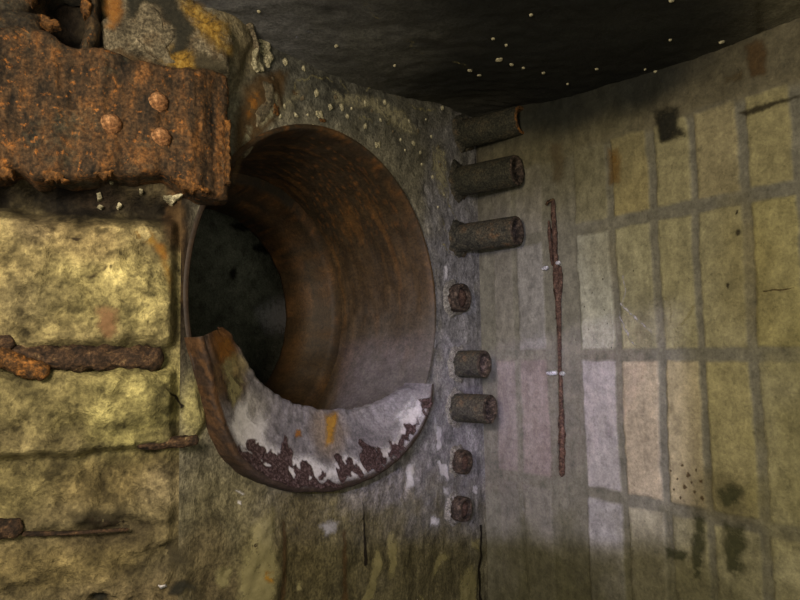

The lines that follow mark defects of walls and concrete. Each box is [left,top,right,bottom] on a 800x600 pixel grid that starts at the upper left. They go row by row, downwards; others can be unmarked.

rust [222,72,285,186]
rust [44,171,71,185]
rust [509,155,525,185]
rust [510,216,524,245]
rust [0,308,164,381]
rust [477,350,492,378]
peeling [225,360,433,489]
rust [482,395,497,424]
damp [718,485,742,506]
rust [0,518,130,539]
damp [667,517,705,577]
damp [724,523,745,572]